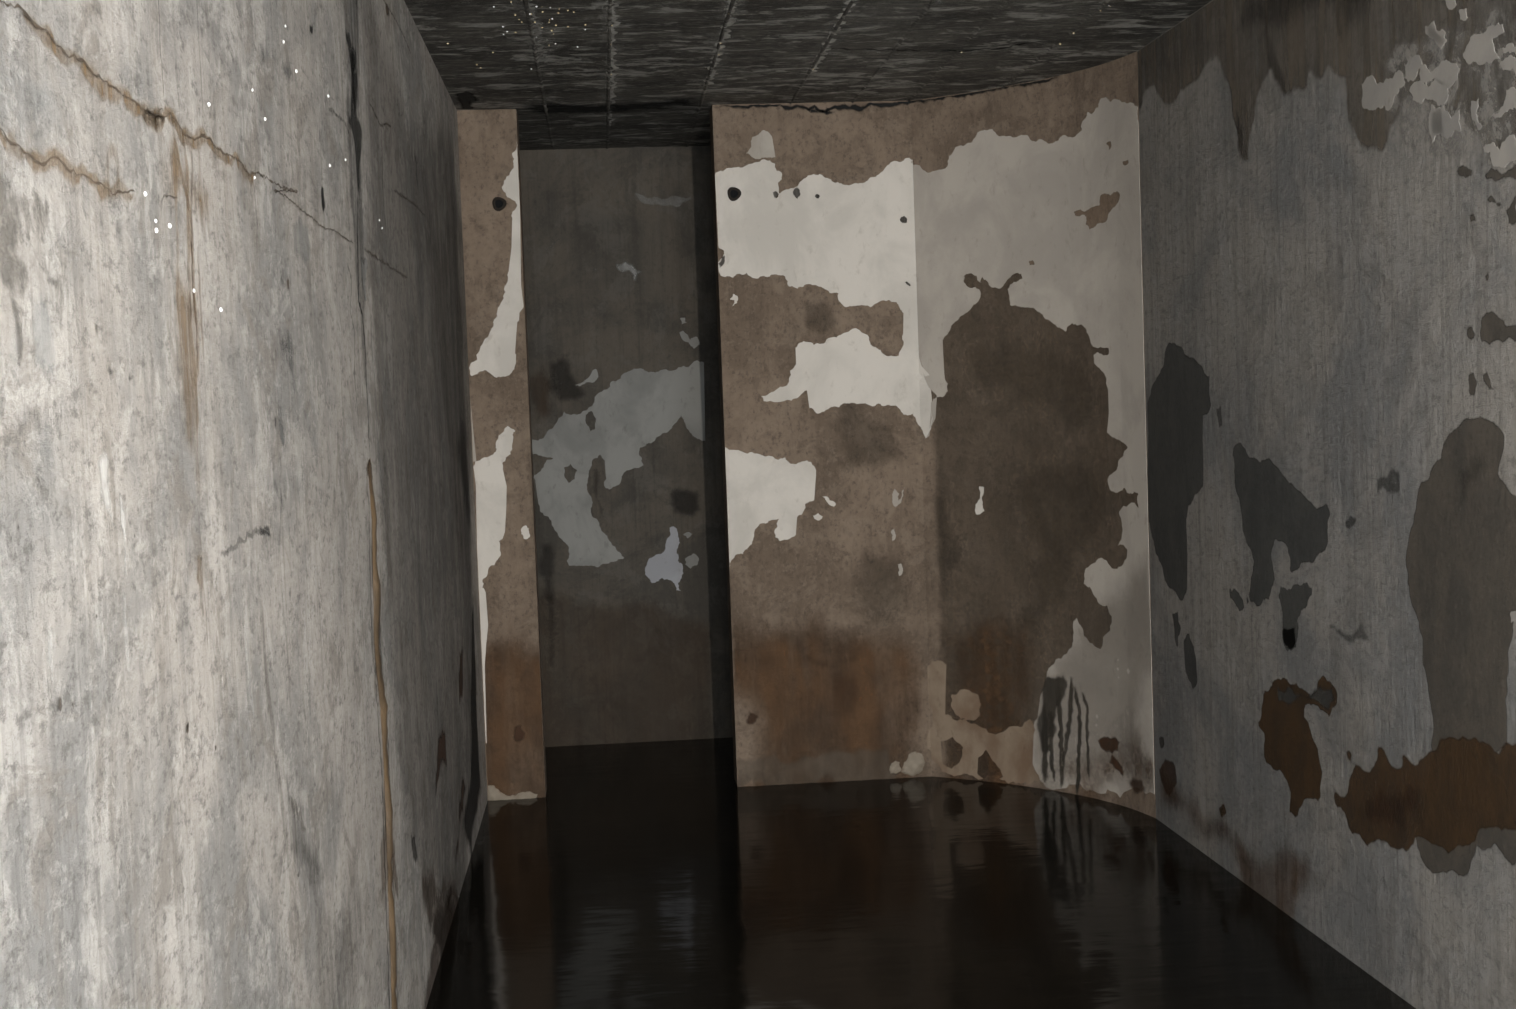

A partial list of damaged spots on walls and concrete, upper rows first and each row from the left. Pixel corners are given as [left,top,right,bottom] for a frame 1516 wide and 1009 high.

corrosion [171,144,203,208]
corrosion [180,225,195,434]
crack [0,0,407,278]
leakage [331,0,366,355]
peeling [469,148,524,378]
peeling [470,400,530,743]
peeling [532,318,705,567]
peeling [715,97,1155,797]
peeling [1362,0,1516,168]
corrosion [367,459,398,1009]
leakage [1038,677,1090,793]
corrosion [1258,676,1516,853]